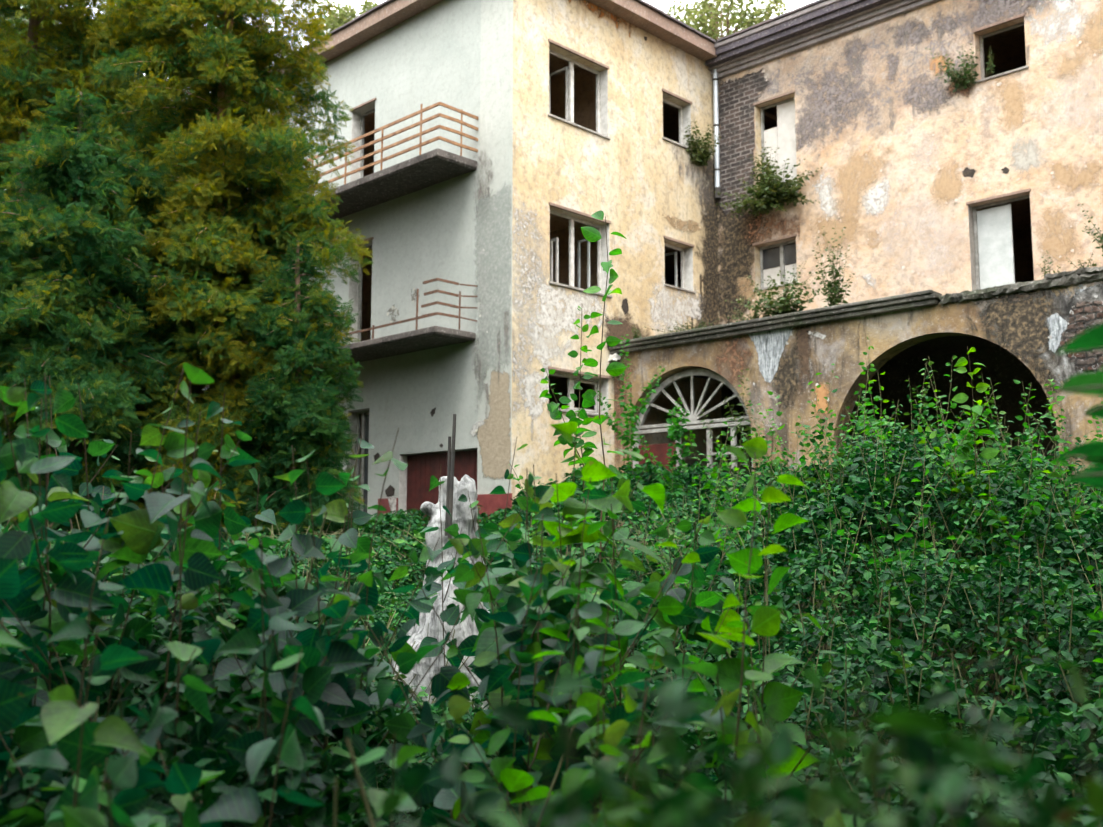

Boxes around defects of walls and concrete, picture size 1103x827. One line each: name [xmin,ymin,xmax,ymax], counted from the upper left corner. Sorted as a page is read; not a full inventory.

damp [762,0,1050,156]
peeling [748,327,793,385]
peeling [967,282,1103,392]